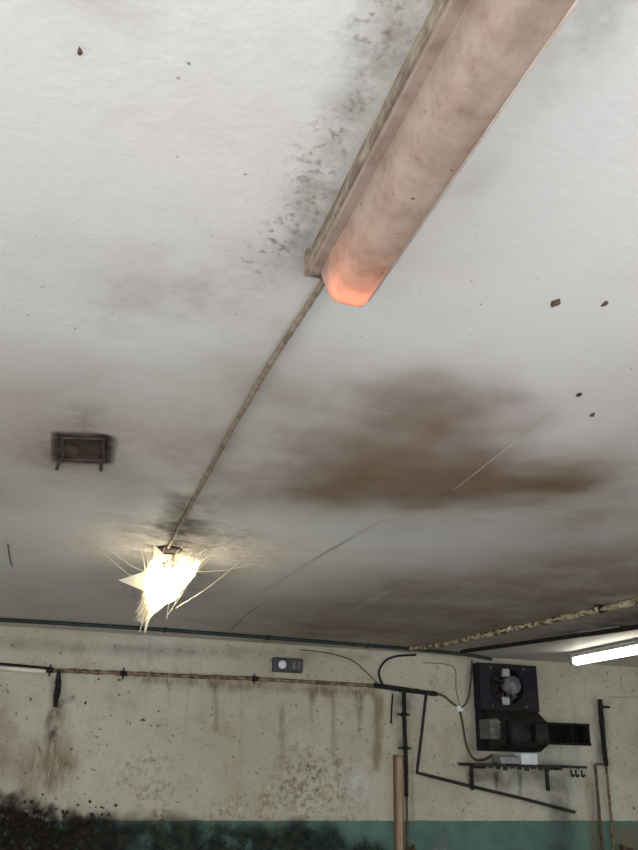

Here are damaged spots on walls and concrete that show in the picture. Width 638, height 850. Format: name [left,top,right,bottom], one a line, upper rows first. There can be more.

leakage [304,446,580,500]